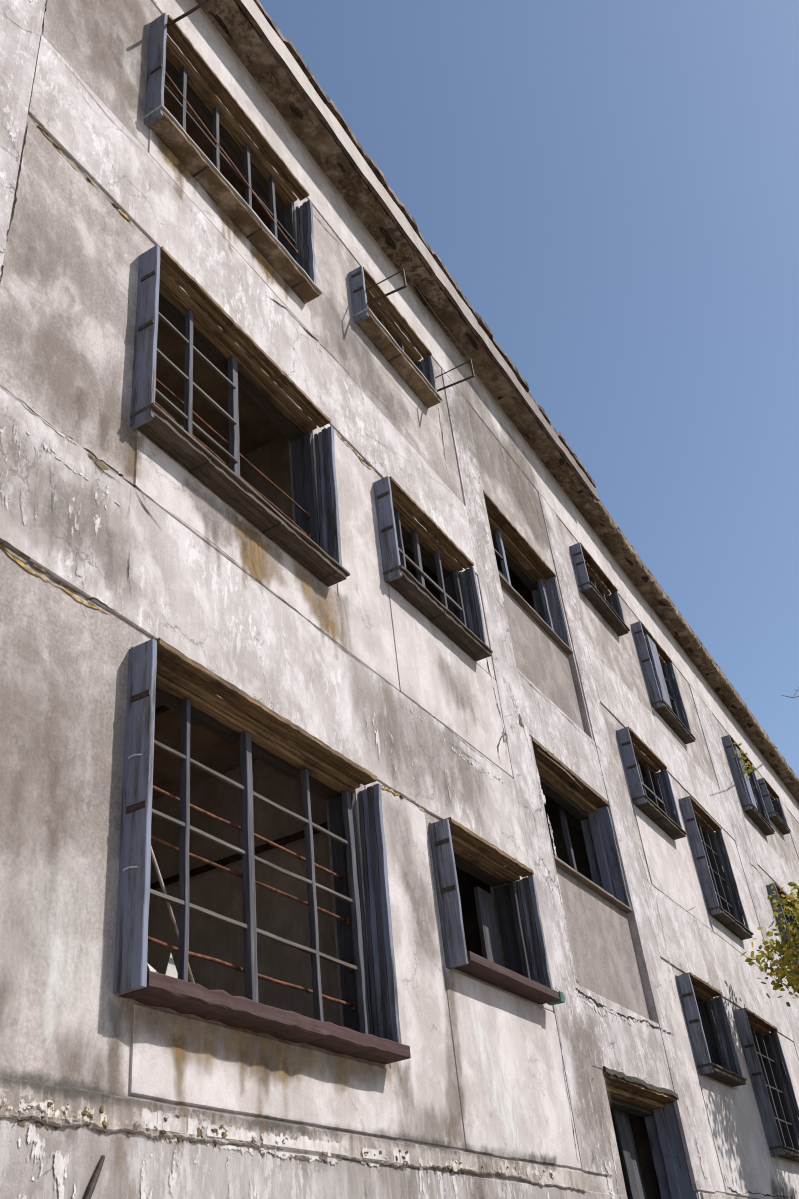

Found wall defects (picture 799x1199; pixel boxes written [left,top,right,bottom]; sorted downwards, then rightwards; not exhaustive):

crack [0,123,30,292]
crack [266,295,449,487]
crack [0,385,536,767]
flaking render [128,1108,556,1199]